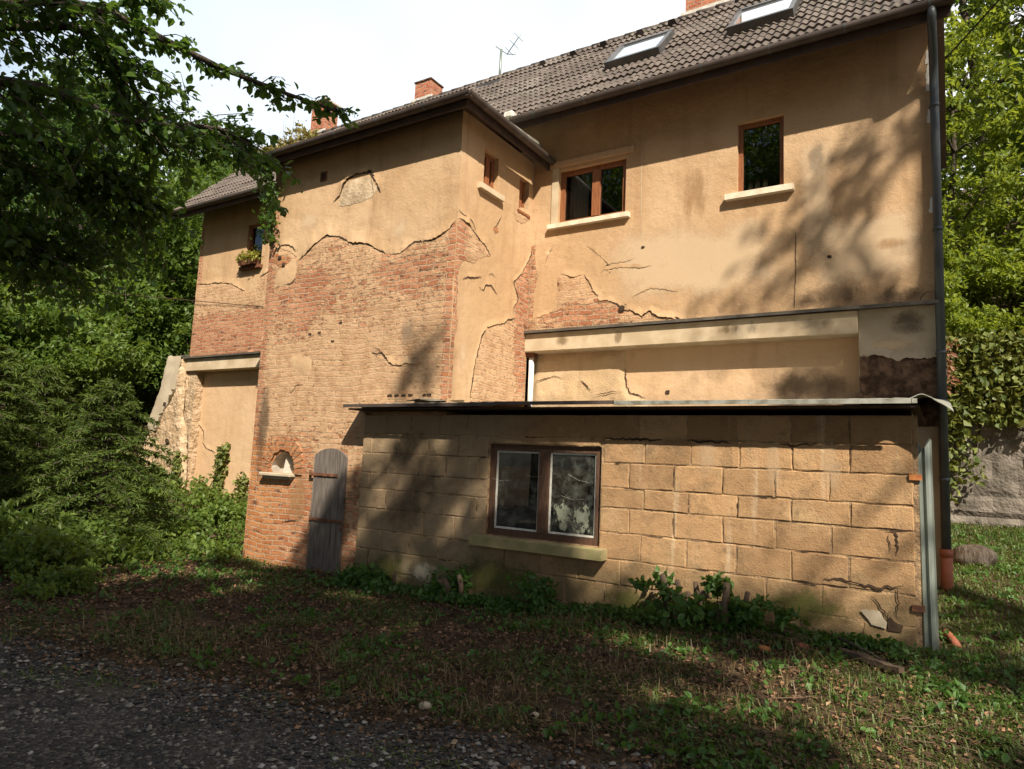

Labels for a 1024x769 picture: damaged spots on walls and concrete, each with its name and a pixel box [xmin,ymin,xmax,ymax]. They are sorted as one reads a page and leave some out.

crack [587,125,680,297]
flaking render [148,183,501,574]
crack [372,347,418,366]
flaking render [467,245,687,407]
flaking render [859,347,938,427]
crack [886,530,899,553]
crack [823,578,903,623]